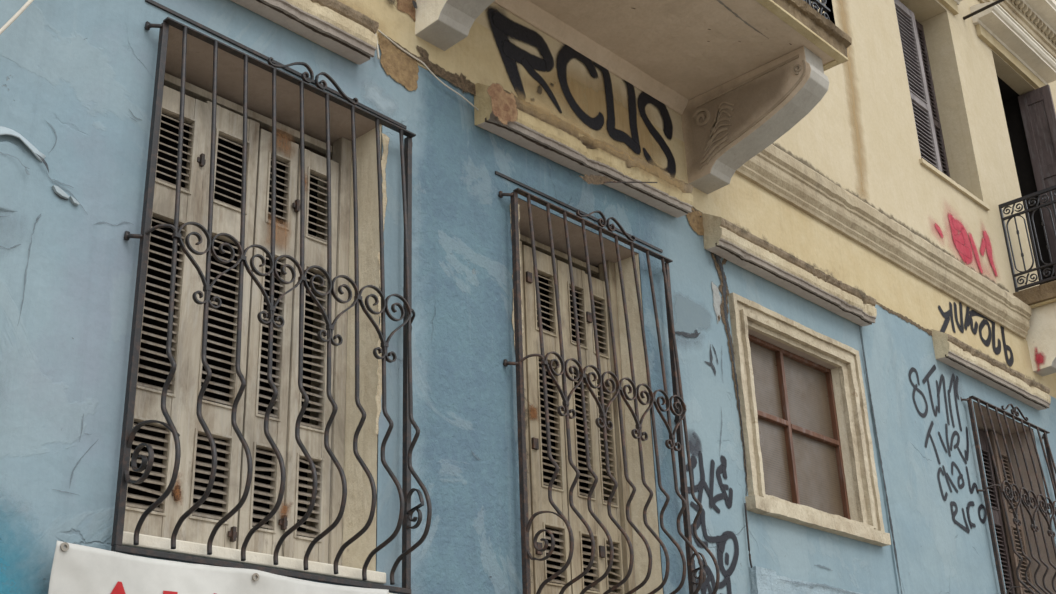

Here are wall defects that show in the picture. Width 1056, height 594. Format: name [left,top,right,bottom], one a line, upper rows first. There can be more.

spalling [388,0,417,21]
peeling [378,33,419,91]
peeling [366,85,394,114]
spalling [487,83,518,125]
crack [0,121,129,319]